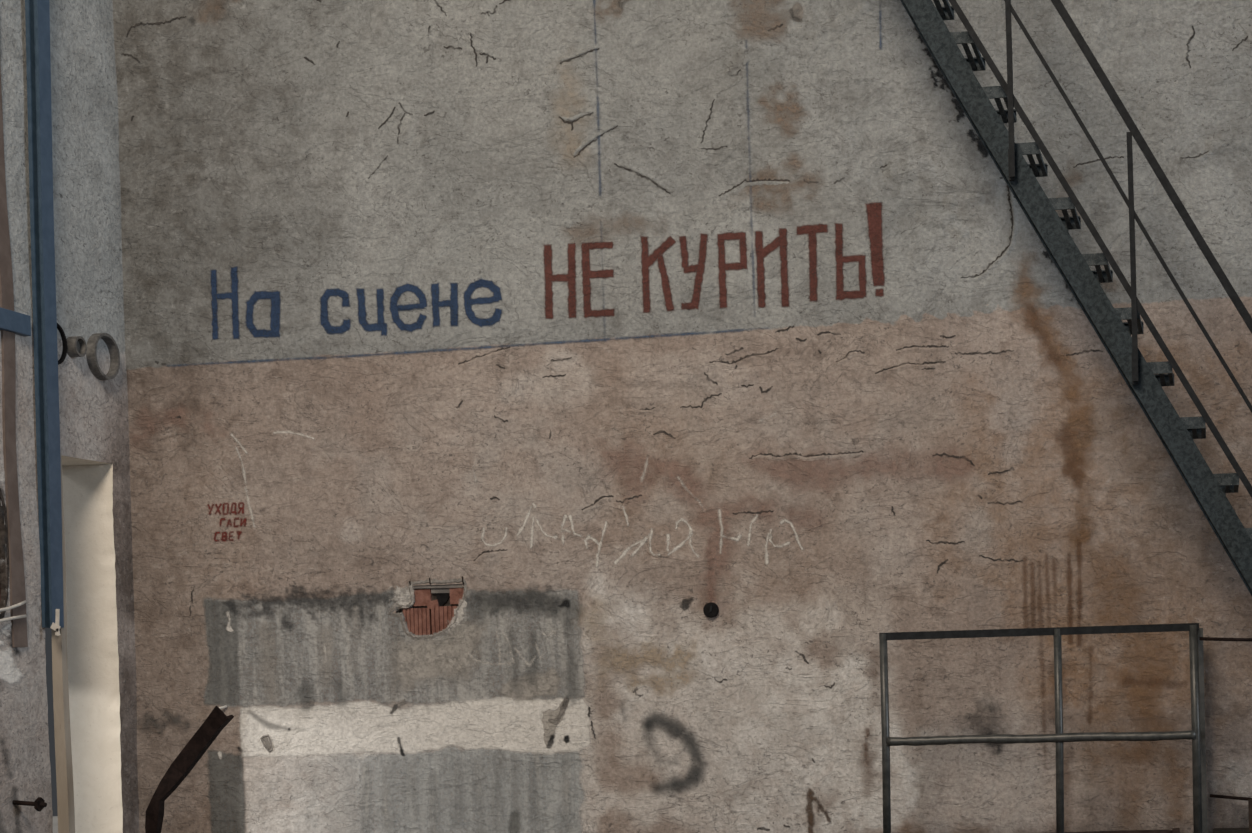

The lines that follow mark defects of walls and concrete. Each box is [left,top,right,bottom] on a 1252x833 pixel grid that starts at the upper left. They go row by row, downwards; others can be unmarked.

crack [121,16,186,63]
crack [428,0,509,66]
crack [1186,26,1195,68]
crack [368,102,435,179]
crack [558,108,673,194]
crack [701,99,727,150]
crack [961,177,1019,283]
crack [543,357,572,378]
crack [615,326,1010,437]
spalling [0,477,22,684]
spalling [388,576,467,640]
corrosion [1067,540,1082,645]